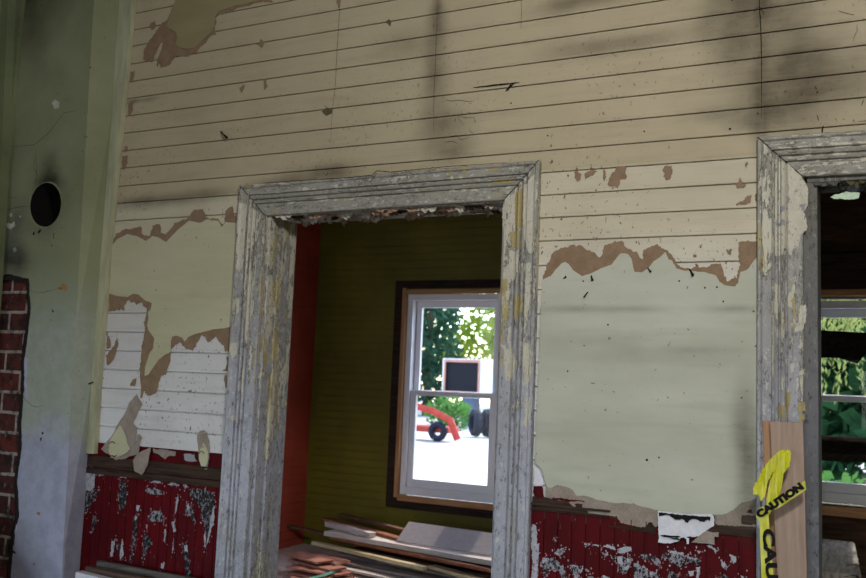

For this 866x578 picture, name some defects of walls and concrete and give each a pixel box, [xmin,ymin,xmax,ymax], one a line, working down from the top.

crack [433,24,519,143]
crack [753,0,764,118]
crack [266,163,494,183]
peeling [771,134,866,259]
peeling [272,166,538,429]
peeling [84,473,105,533]
peeling [109,470,216,577]
peeling [530,522,610,578]
peeling [582,542,736,578]